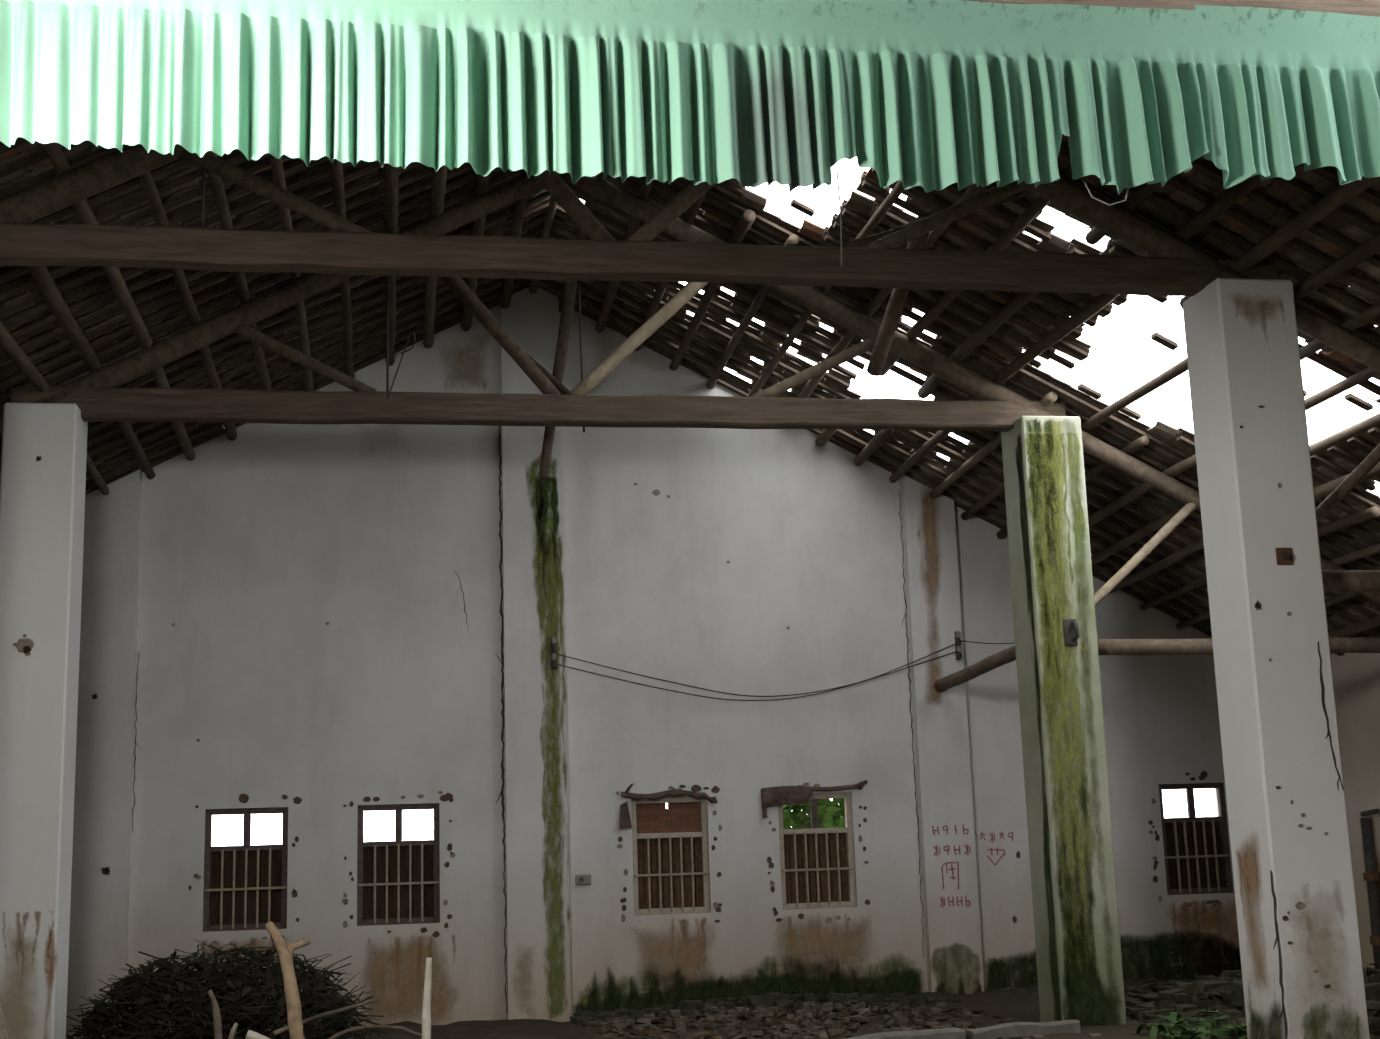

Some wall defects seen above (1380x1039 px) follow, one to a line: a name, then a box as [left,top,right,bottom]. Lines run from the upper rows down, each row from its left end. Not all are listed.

corrosion [923,491,938,603]
spalling [13,634,34,656]
crack [1318,642,1344,790]
water stain [368,939,446,1018]
water stain [643,919,706,985]
water stain [784,924,863,979]